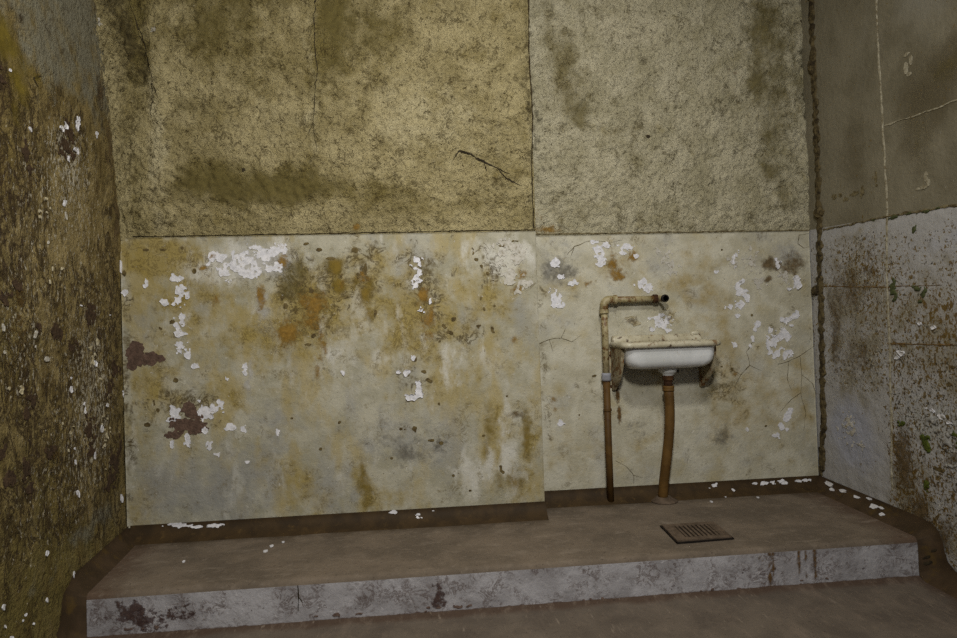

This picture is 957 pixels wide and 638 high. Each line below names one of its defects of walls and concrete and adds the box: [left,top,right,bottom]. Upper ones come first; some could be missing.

crack [453,150,522,186]
peeling [159,243,288,369]
leakage [230,253,280,271]
peeling [409,256,424,289]
peeling [472,237,533,295]
peeling [548,257,579,308]
peeling [590,240,639,267]
peeling [624,307,676,333]
peeling [724,278,800,360]
spalling [33,322,166,503]
spalling [153,399,247,457]
leakage [895,427,912,487]